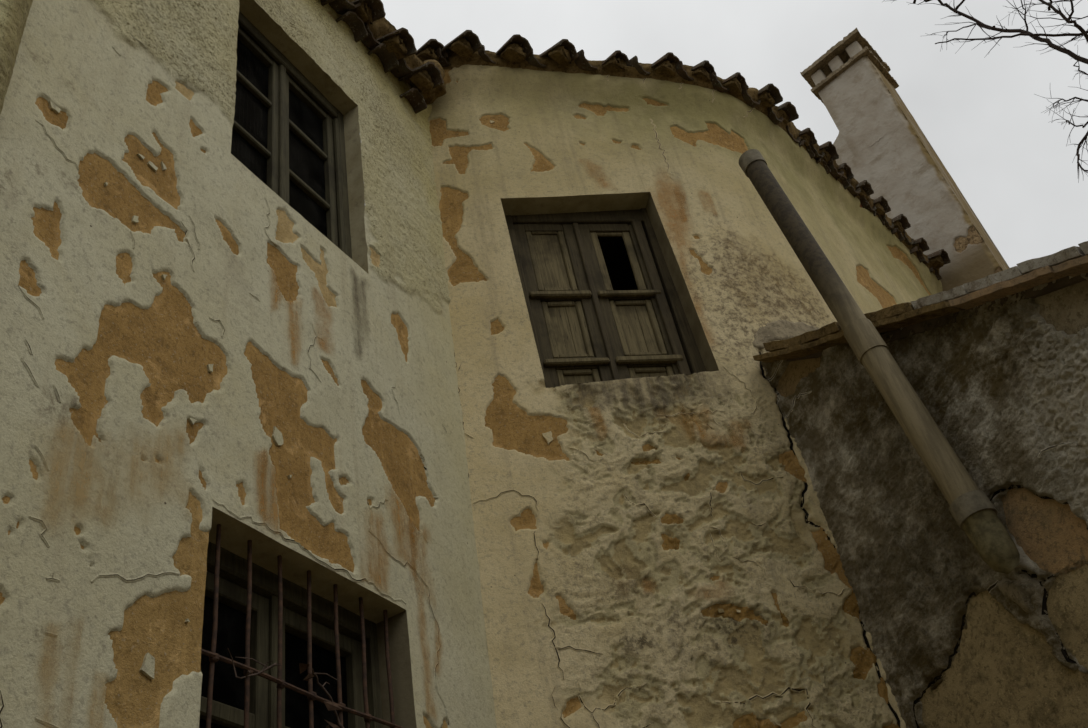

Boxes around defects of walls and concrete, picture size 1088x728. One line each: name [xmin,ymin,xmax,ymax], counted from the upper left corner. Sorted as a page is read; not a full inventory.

flaking render [77,132,185,242]
flaking render [54,271,227,446]
flaking render [244,341,354,572]
flaking render [361,380,435,531]
crack [723,352,812,455]
crack [800,481,835,548]
crack [990,485,1088,530]
crack [0,688,8,728]
flaking render [105,470,209,728]
crack [538,597,646,728]
crack [715,556,1077,728]
spalling [920,488,1088,728]